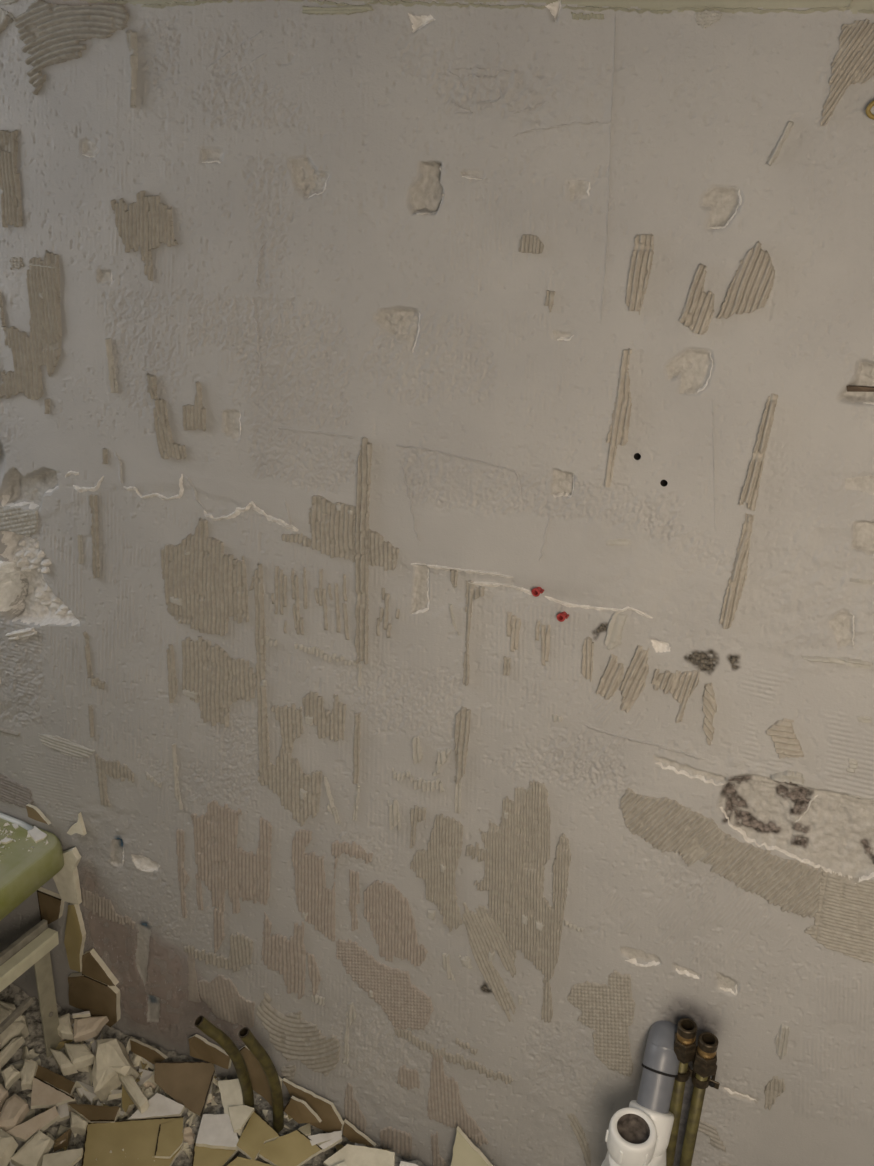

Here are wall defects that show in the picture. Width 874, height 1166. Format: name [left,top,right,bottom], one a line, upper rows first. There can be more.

spalling [409,161,444,215]
spalling [838,361,874,405]
spalling [0,443,59,509]
crack [65,471,299,532]
spalling [0,531,80,627]
spalling [651,639,671,653]
spalling [1,804,51,844]
spalling [653,755,874,884]
spalling [131,854,160,872]
spalling [620,947,738,995]
spalling [6,1034,418,1166]
spalling [451,1126,493,1166]